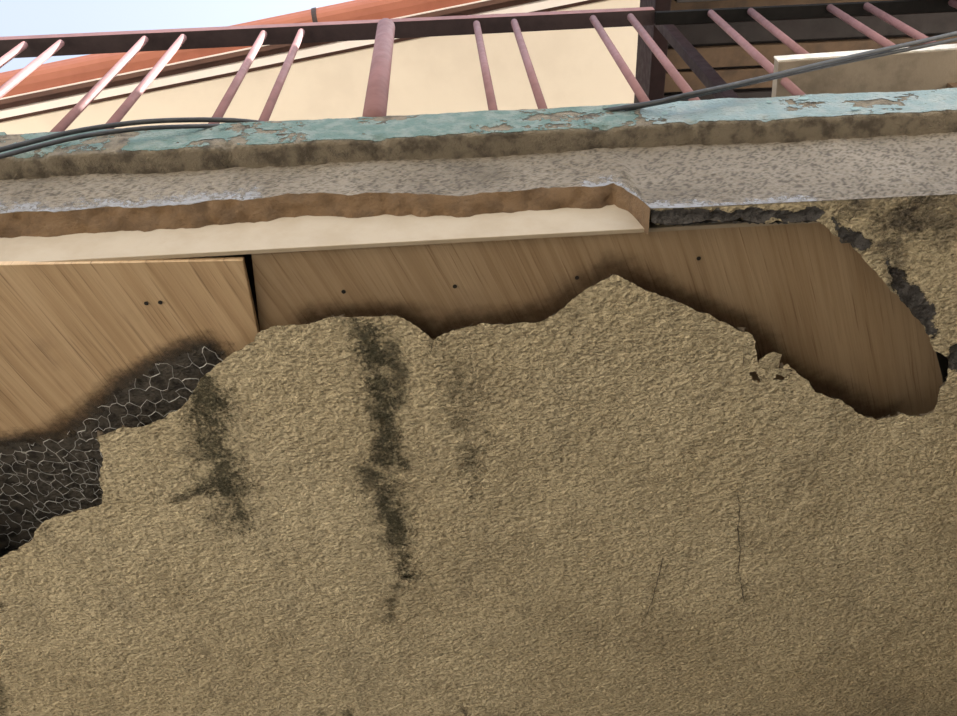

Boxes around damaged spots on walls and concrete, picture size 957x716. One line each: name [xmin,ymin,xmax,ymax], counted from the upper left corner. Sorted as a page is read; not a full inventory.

peeling [0,128,119,158]
peeling [121,88,957,151]
flaking render [0,175,872,251]
flaking render [884,258,938,339]
flaking render [756,352,796,379]
damp [173,374,253,532]
damp [302,262,896,618]